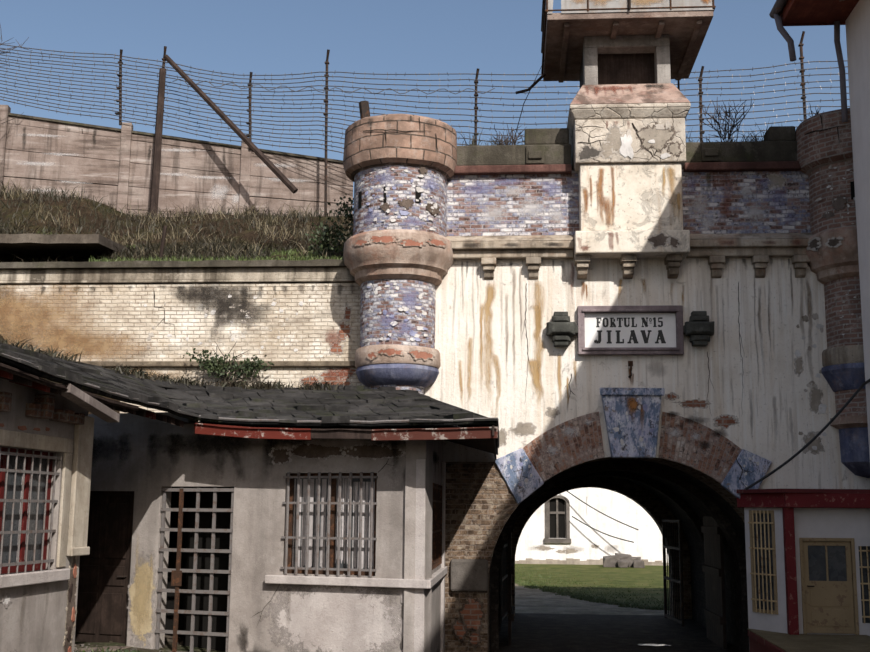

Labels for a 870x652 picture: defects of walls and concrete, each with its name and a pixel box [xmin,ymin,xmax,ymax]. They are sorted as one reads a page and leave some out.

crack [578,126,604,147]
flaking render [577,121,682,162]
flaking render [353,167,447,248]
flaking render [644,232,682,249]
water stain [0,287,138,357]
water stain [178,286,261,325]
corrosion [529,286,543,392]
flaking render [794,313,827,414]
water stain [92,438,128,459]
water stain [170,435,249,472]
water stain [265,439,299,464]
flaking render [63,556,78,652]